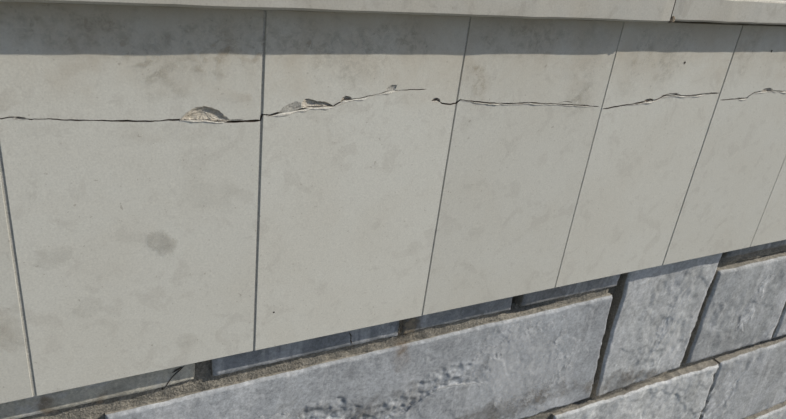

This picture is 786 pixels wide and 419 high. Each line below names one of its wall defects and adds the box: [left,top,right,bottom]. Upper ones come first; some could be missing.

crack [0,89,786,123]